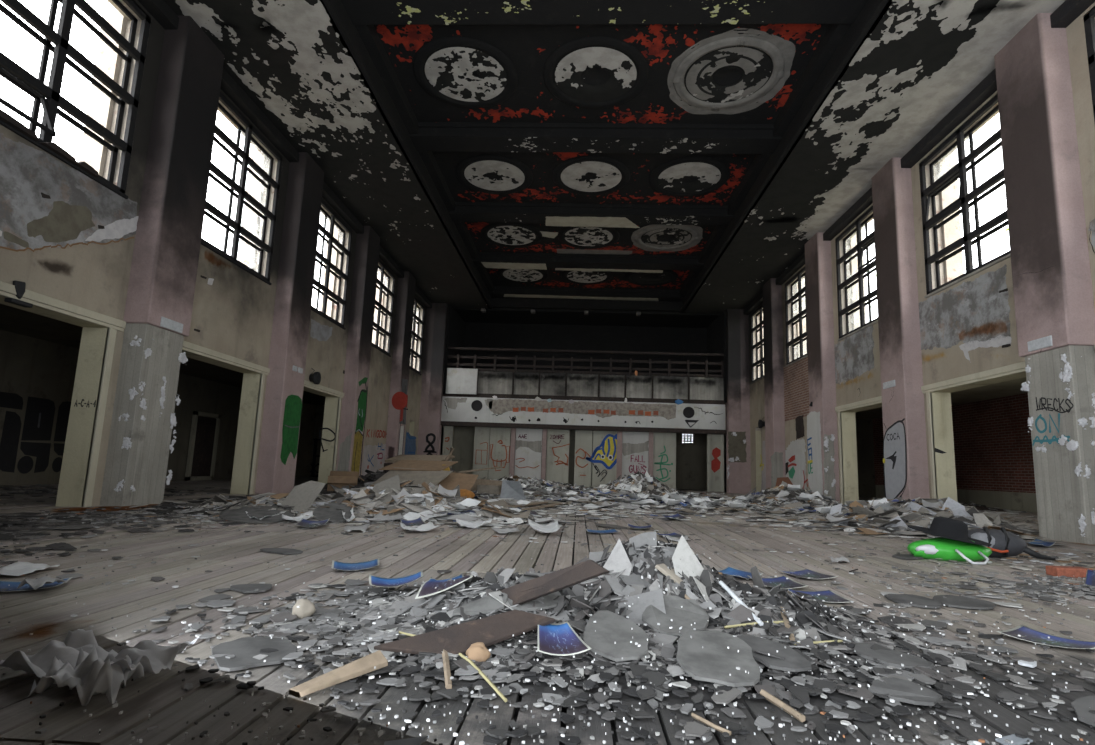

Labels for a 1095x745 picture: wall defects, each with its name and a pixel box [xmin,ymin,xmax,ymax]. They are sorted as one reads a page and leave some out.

peeling [176,0,411,198]
peeling [377,2,564,123]
peeling [600,103,689,124]
peeling [555,0,765,88]
peeling [744,0,1066,249]
peeling [0,133,138,252]
spalling [458,137,748,301]
peeling [1059,354,1074,399]
peeling [1058,393,1095,451]
peeling [1074,462,1091,478]
peeling [1078,508,1095,537]